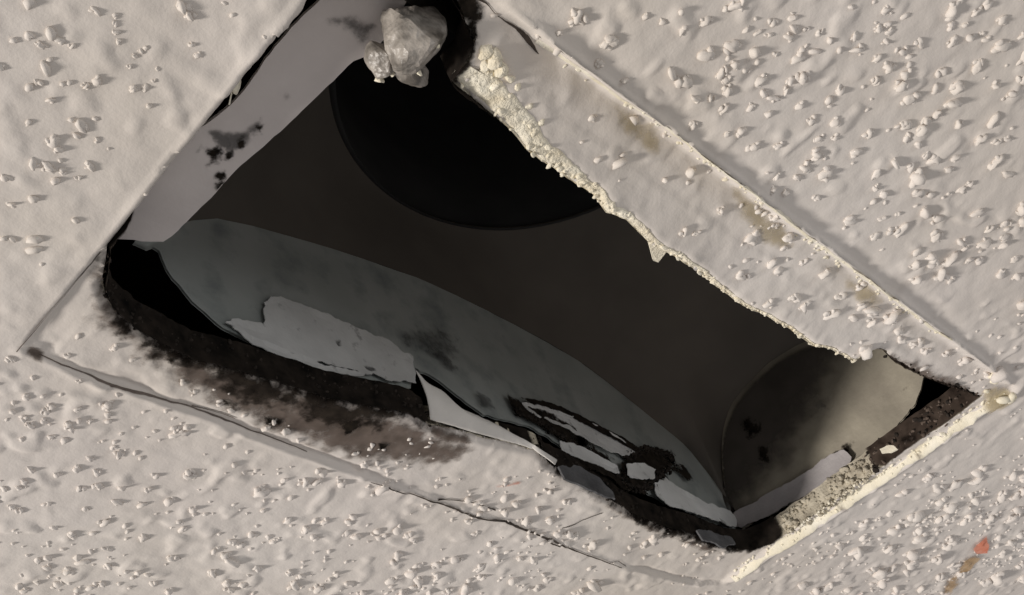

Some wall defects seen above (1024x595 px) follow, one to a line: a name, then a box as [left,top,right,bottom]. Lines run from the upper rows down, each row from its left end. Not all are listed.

flaking render [453,44,861,363]
peeling [226,296,416,384]
peeling [522,402,876,536]
peeling [880,445,898,454]
rust [945,538,989,593]